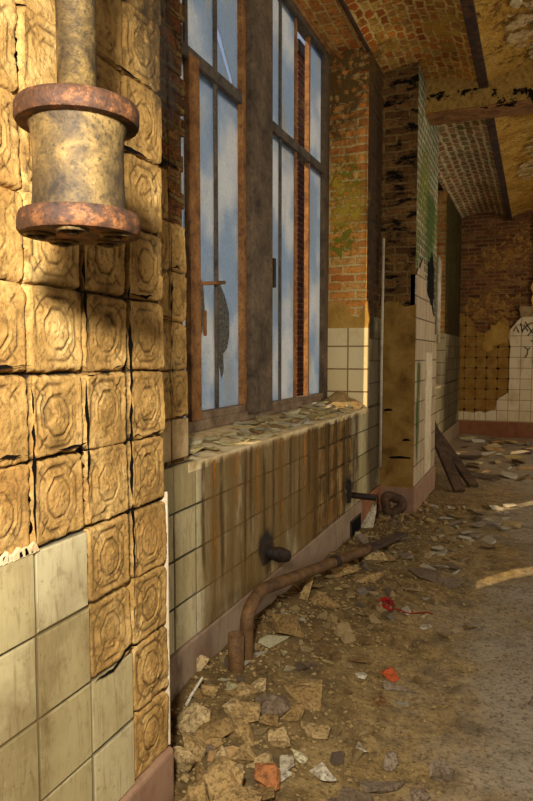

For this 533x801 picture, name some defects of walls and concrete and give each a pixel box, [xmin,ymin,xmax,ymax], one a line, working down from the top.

peeling [505,0,533,60]
crack [0,363,31,371]
crack [0,389,37,538]
crack [59,237,186,620]
spalling [0,0,354,780]
spalling [458,285,526,413]
crack [96,643,134,681]